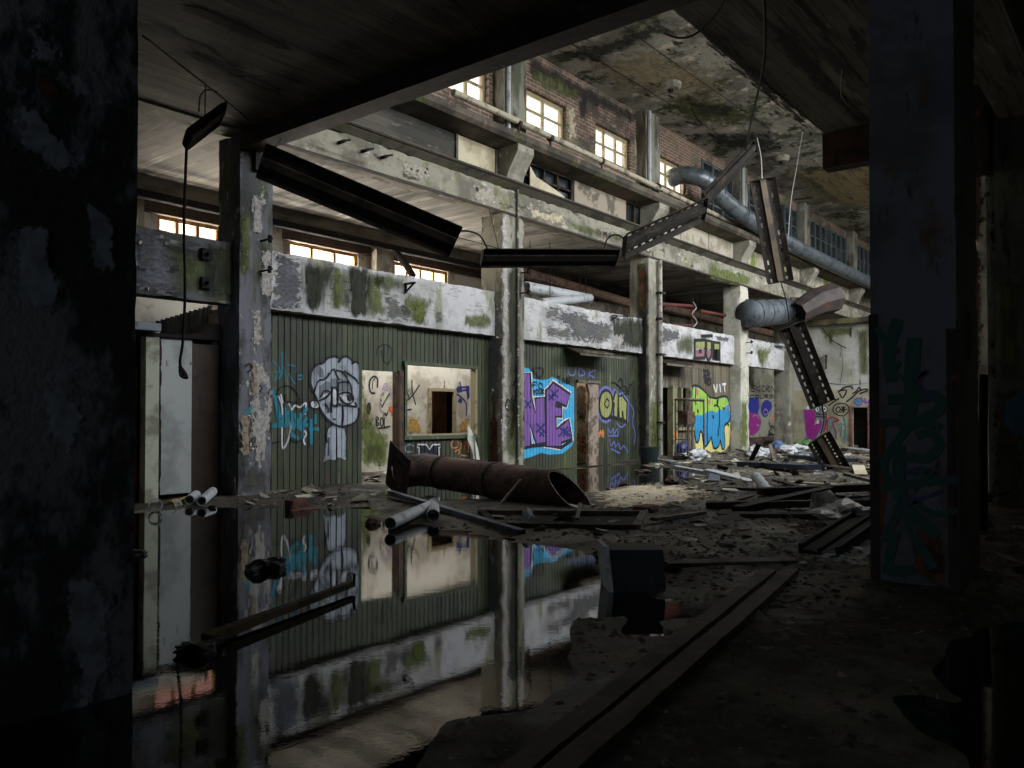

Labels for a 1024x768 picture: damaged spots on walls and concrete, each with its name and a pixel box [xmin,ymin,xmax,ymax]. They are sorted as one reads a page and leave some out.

leakage [560,19,726,102]
leakage [693,132,794,153]
peeling [251,195,263,235]
leakage [301,263,403,316]
leakage [414,304,424,323]
peeling [545,305,613,346]
peeling [240,310,273,467]